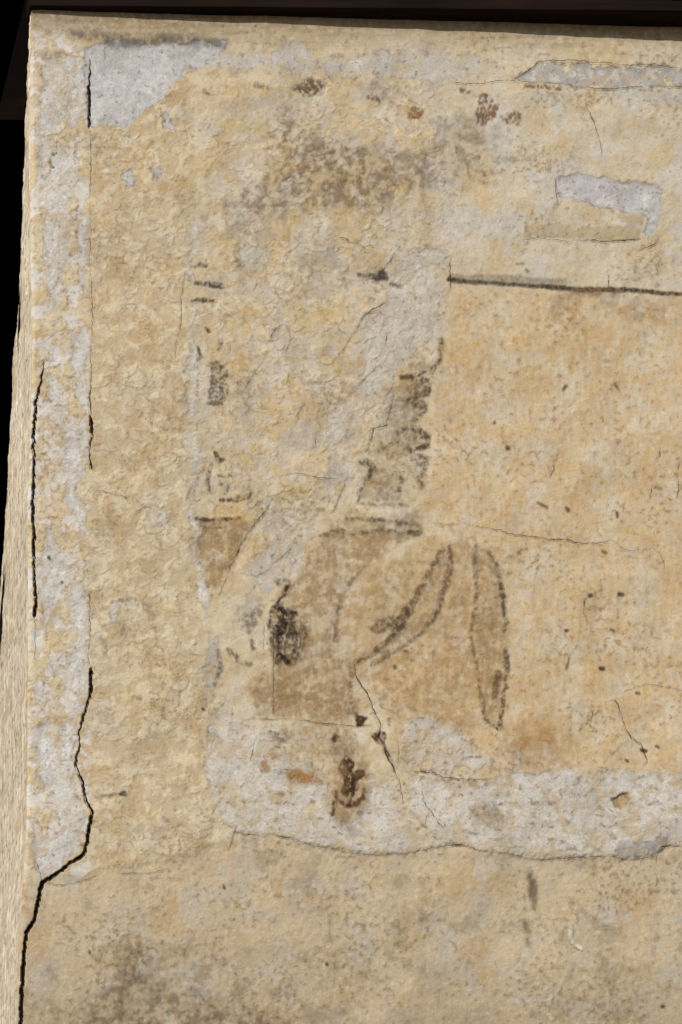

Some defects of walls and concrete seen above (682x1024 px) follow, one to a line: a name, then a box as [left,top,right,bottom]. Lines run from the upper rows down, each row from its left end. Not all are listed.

crack [85,65,93,188]
peeling [37,39,481,293]
peeling [516,61,682,102]
peeling [556,173,662,237]
peeling [354,248,448,395]
crack [31,362,44,655]
crack [89,355,145,512]
peeling [184,432,211,617]
peeling [319,404,361,450]
crack [19,595,98,1024]
peeling [203,705,682,860]
crack [305,667,681,861]